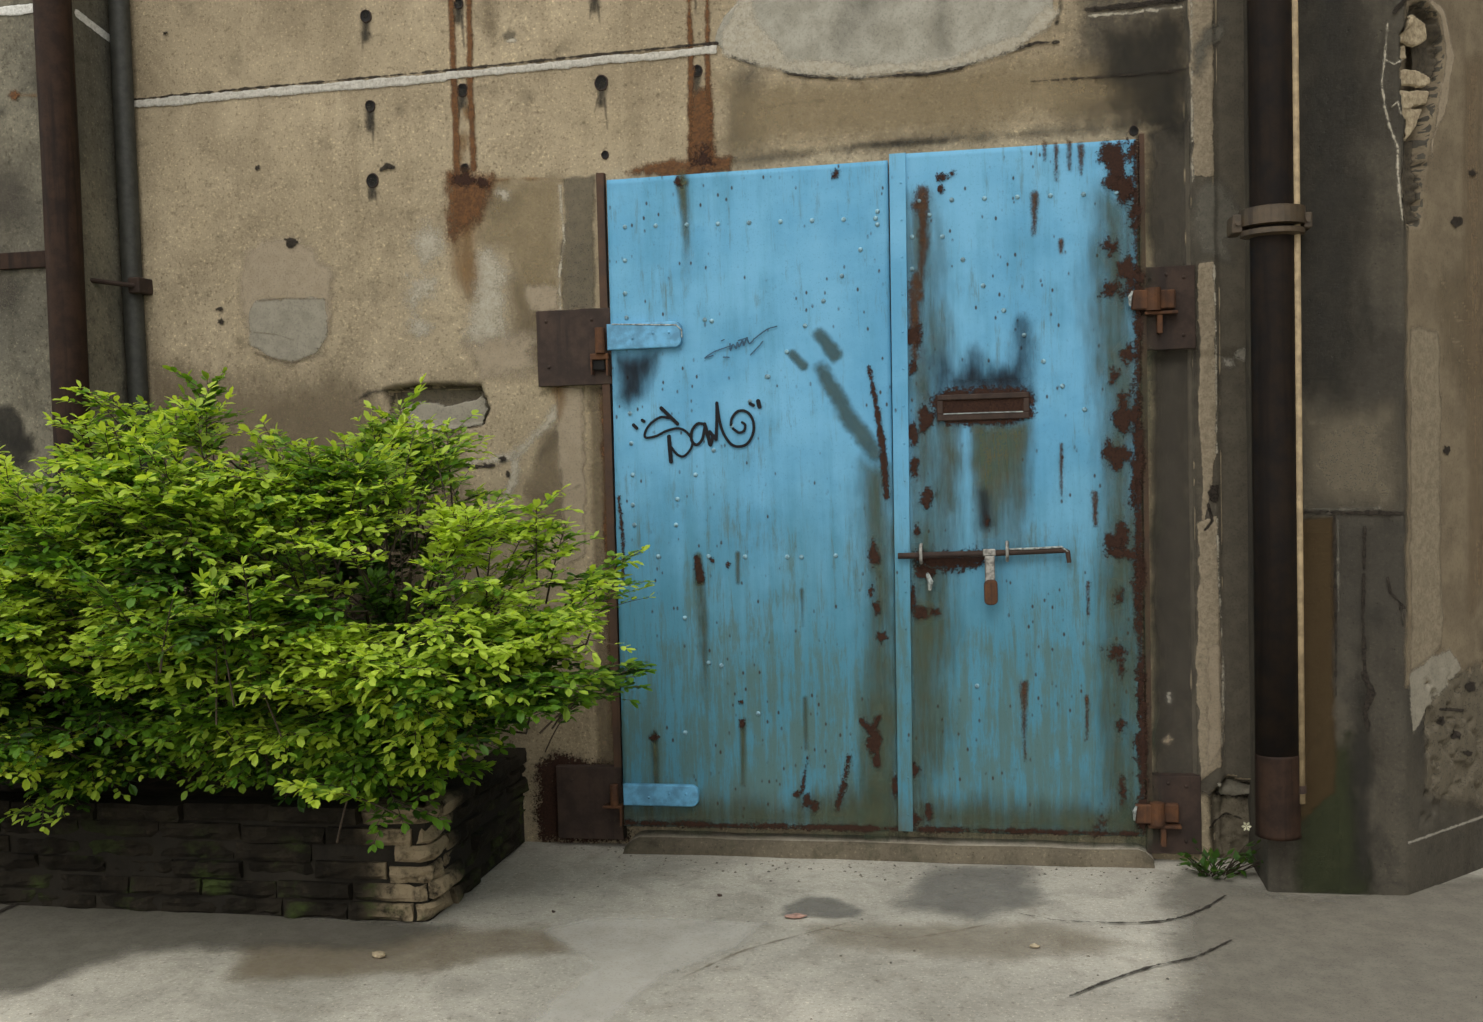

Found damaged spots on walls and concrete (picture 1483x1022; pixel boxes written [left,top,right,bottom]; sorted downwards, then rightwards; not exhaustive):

rust [444,0,507,288]
rust [625,0,733,232]
rust [907,170,957,376]
rust [1030,191,1039,234]
spalling [363,385,490,430]
rust [1042,137,1152,805]
flaking render [1399,0,1483,808]
rust [526,364,1147,844]
crack [1025,895,1226,923]
crack [1069,940,1231,996]